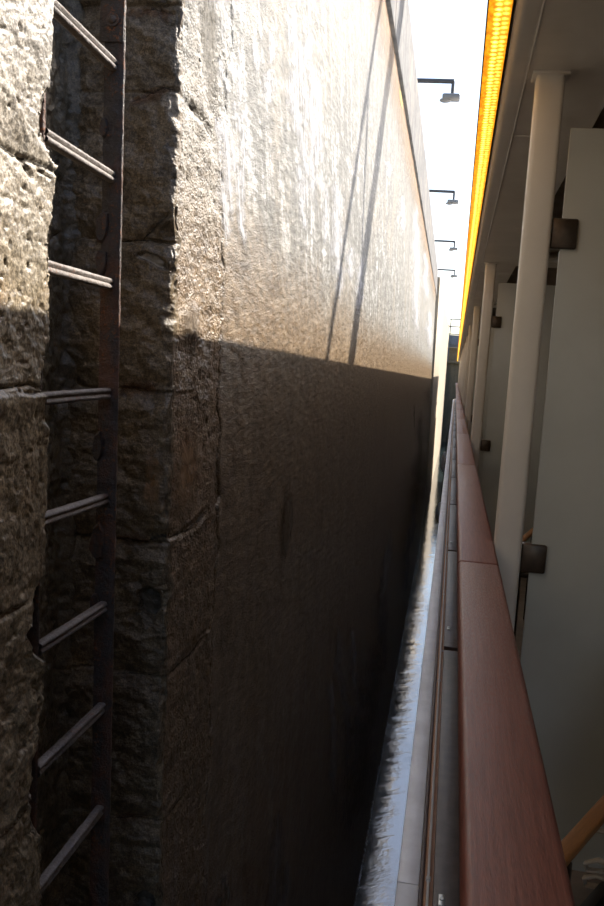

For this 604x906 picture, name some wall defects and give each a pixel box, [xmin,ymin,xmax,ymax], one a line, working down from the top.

water stain [215,59,246,238]
water stain [287,24,321,226]
water stain [324,185,363,304]
water stain [375,0,435,348]